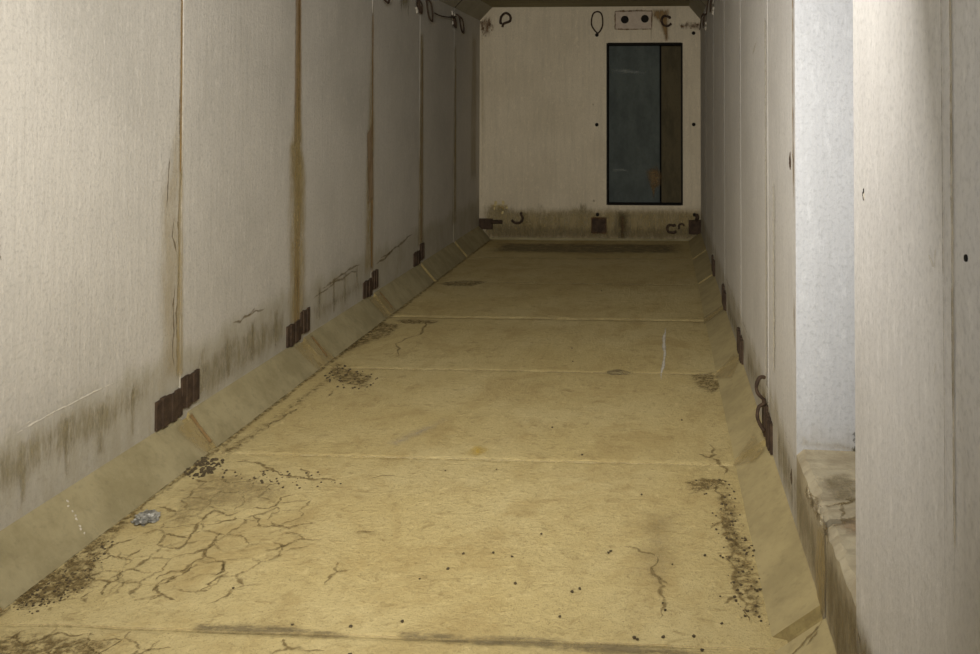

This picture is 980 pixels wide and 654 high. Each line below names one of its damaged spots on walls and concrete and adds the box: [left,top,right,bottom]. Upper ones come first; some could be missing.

rust [292,0,304,323]
damp [14,207,697,604]
damp [0,635,103,654]
crack [55,460,335,602]
crack [633,547,666,616]